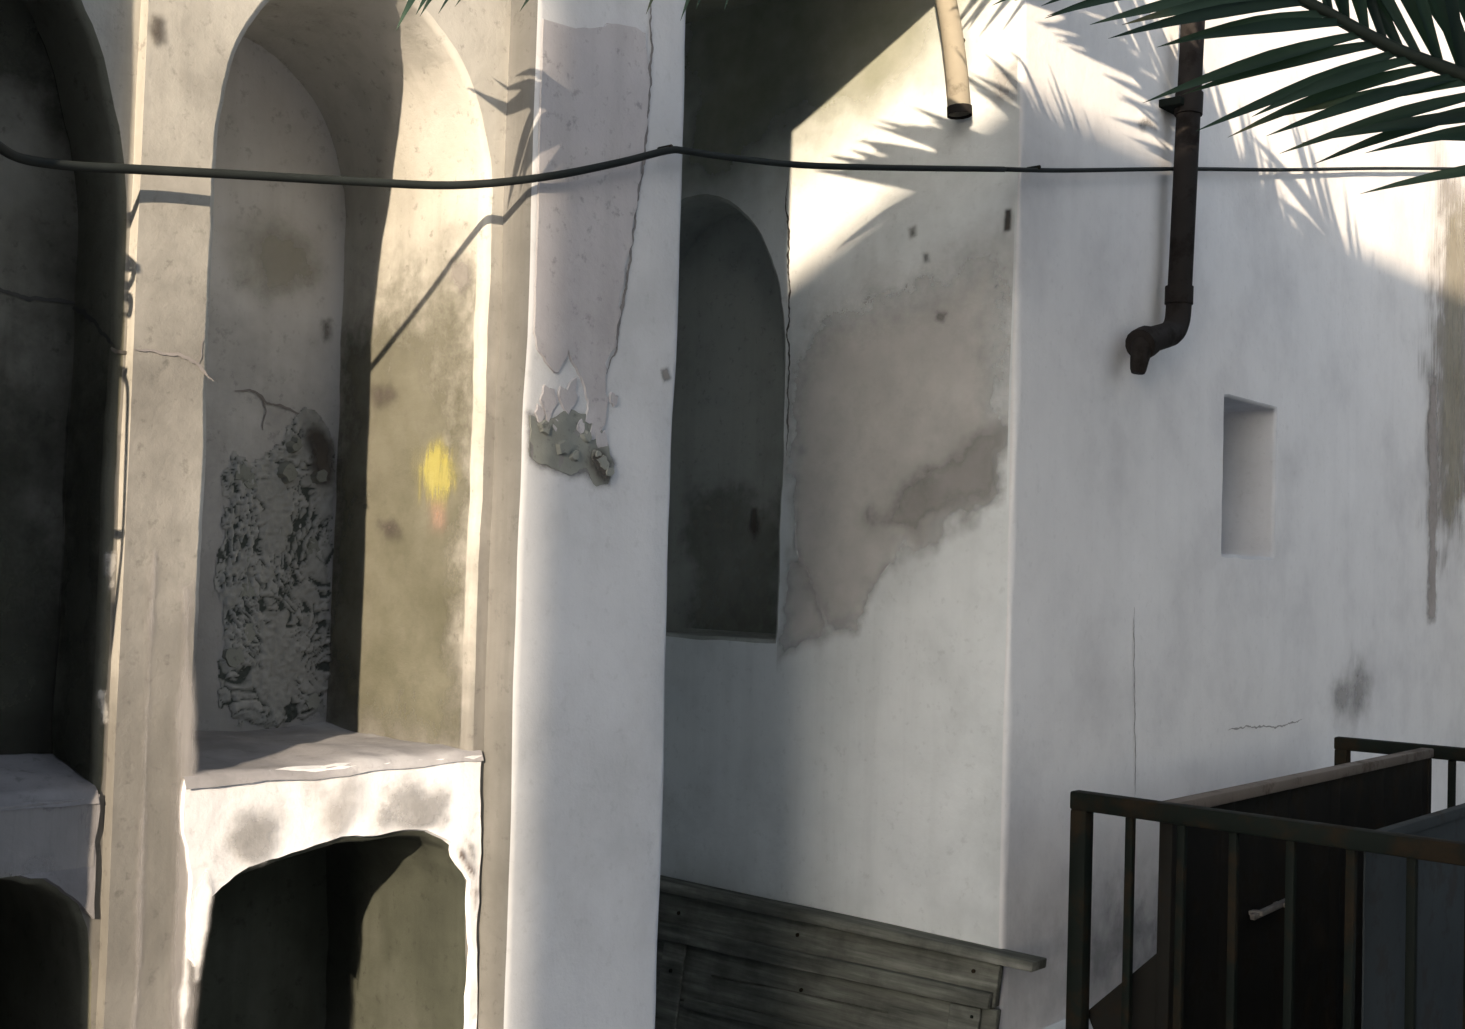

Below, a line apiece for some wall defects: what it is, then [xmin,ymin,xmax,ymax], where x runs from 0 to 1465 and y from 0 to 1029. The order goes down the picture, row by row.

crack [0,288,299,430]
spalling [214,407,336,729]
damp [330,263,473,742]
peeling [528,19,650,487]
crack [784,181,792,456]
damp [685,260,1004,648]